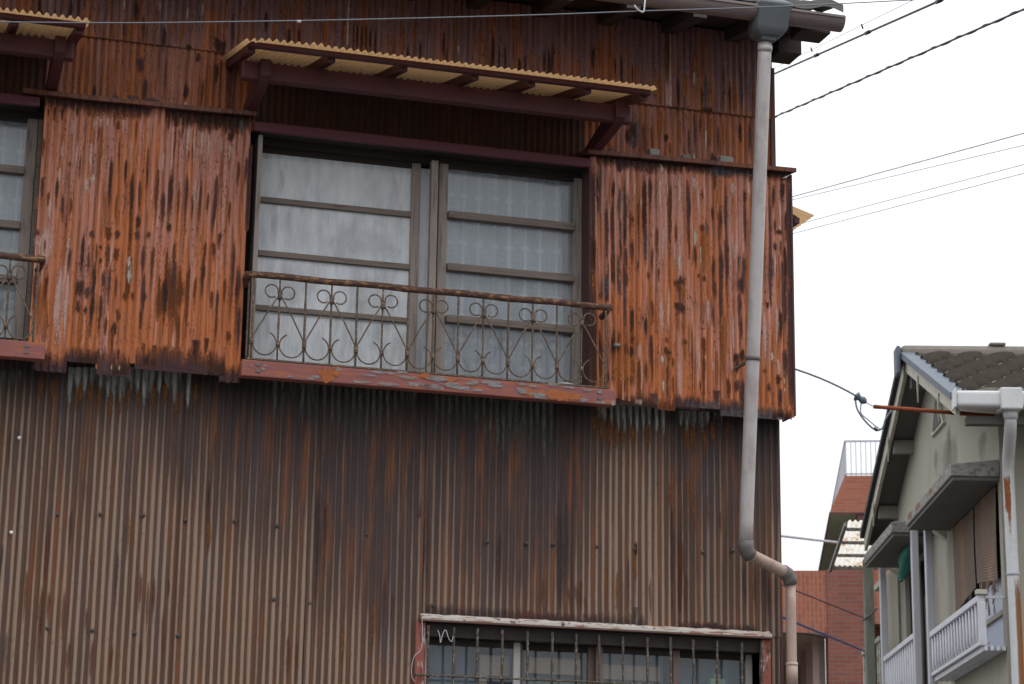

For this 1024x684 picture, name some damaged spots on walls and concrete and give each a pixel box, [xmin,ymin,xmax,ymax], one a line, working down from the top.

corrosion [315,0,421,59]
corrosion [472,31,561,73]
corrosion [577,39,639,85]
corrosion [32,0,253,422]
corrosion [589,52,756,452]
corrosion [757,171,795,420]
peeling [308,366,342,383]
peeling [354,370,503,392]
peeling [517,382,616,406]
corrosion [518,582,597,623]
corrosion [677,545,724,630]